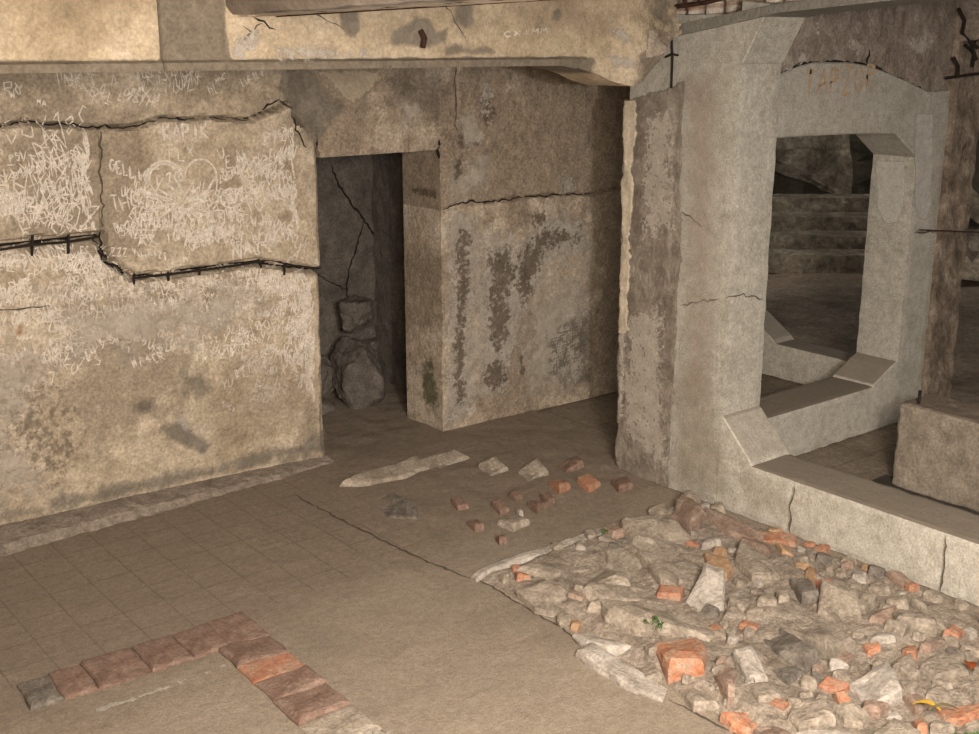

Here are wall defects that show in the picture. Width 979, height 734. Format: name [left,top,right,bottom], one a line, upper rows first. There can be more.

spalling [674,0,756,10]
crack [0,99,374,298]
crack [443,193,588,210]
damp [521,266,589,397]
crack [788,488,796,532]
crack [939,537,947,591]